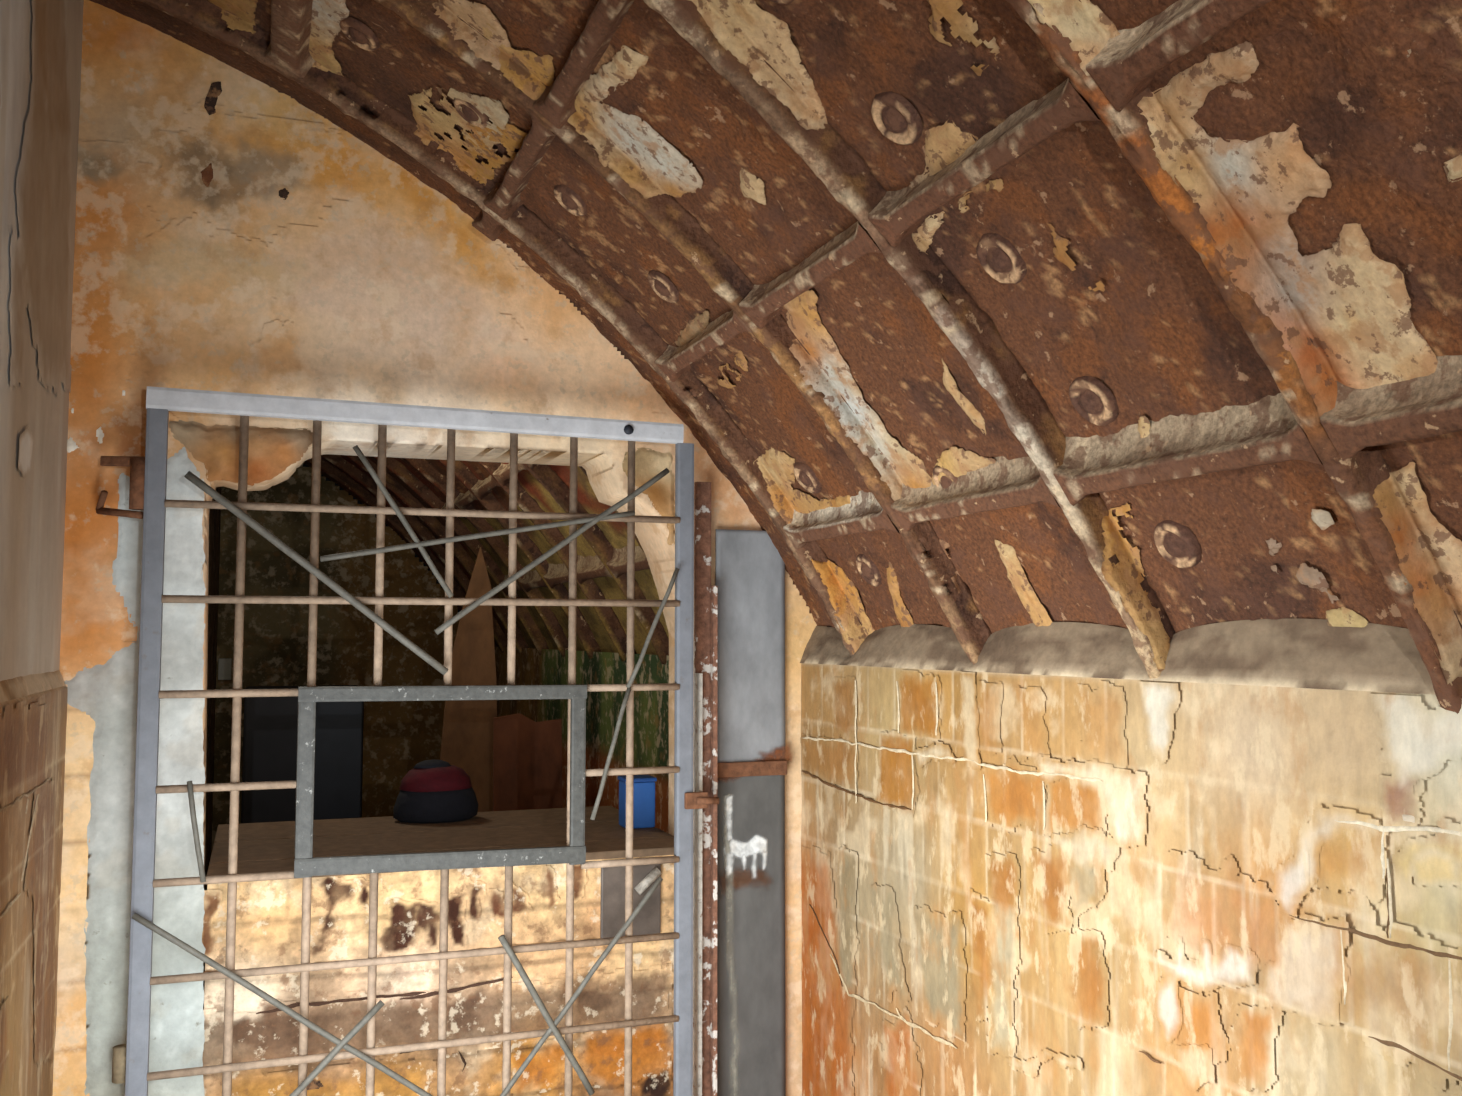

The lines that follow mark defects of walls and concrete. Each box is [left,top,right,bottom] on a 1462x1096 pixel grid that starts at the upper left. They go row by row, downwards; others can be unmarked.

peeling [689,0,827,130]
corrosion [182,99,529,296]
peeling [1137,41,1438,417]
corrosion [59,139,161,687]
corrosion [642,380,762,531]
peeling [1373,462,1462,686]
crack [0,778,51,919]
leakage [803,672,1180,928]
leakage [1153,804,1462,1093]
crack [1290,868,1462,960]
efflorescence [1368,694,1462,794]
crack [1369,1036,1462,1081]